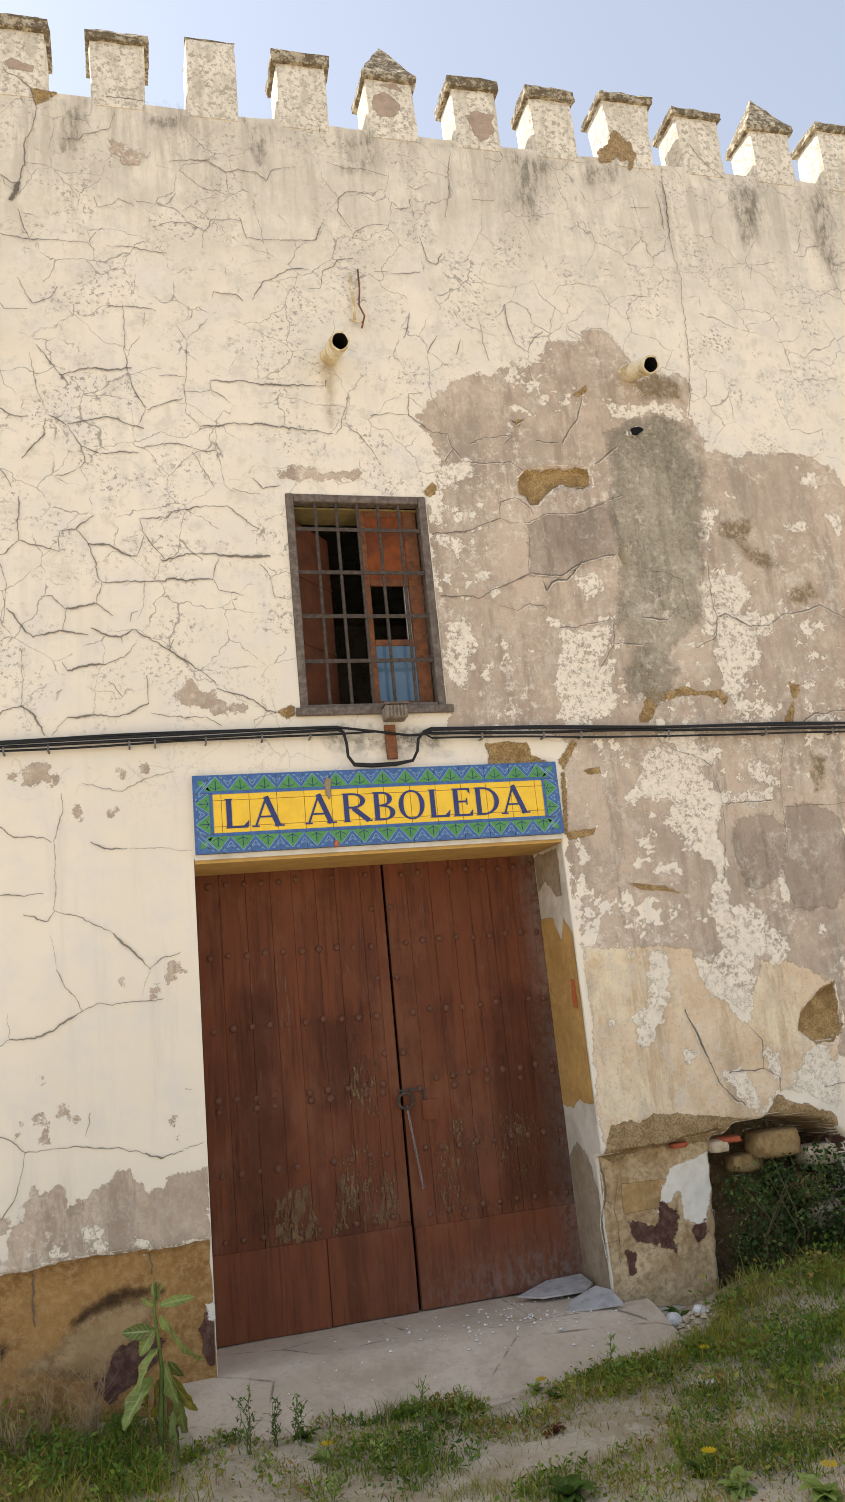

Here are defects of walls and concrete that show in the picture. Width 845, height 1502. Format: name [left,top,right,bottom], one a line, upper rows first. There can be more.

crack [0,70,844,736]
peeling [277,464,363,483]
peeling [174,678,249,716]
peeling [7,762,60,788]
peeling [115,762,150,780]
peeling [415,328,845,1307]
crack [0,771,185,1046]
crack [0,1114,199,1220]
flaking render [0,1167,217,1428]